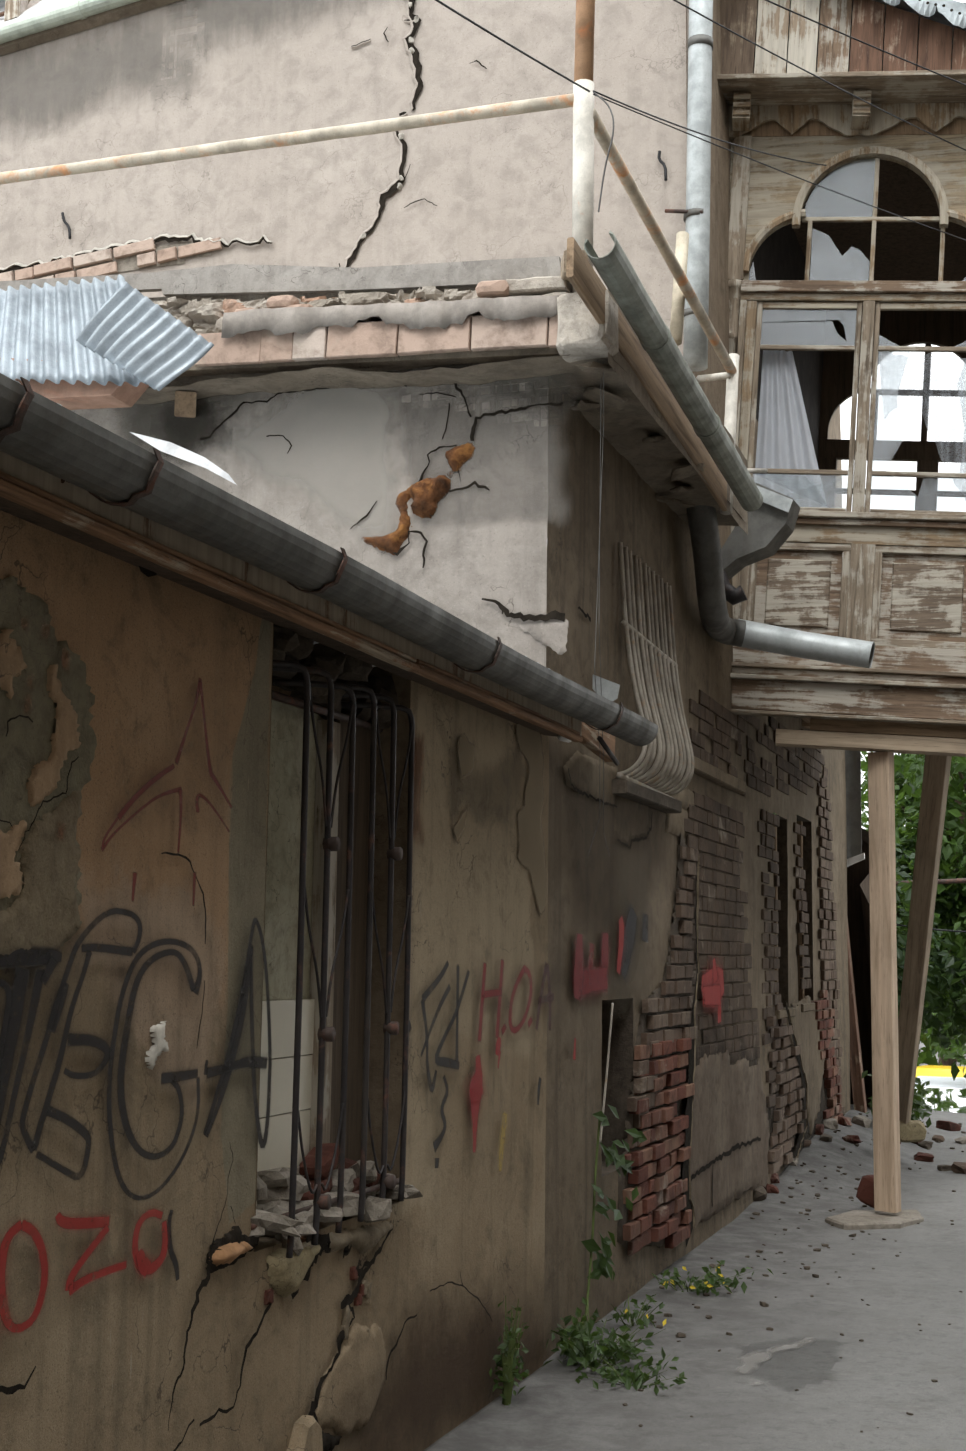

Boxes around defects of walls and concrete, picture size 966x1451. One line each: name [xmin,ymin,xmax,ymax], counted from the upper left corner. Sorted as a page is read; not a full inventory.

crack [339,0,437,267]
flaking render [0,233,272,281]
crack [200,388,329,454]
crack [350,501,377,529]
crack [392,530,428,568]
crack [404,383,563,492]
flaking render [0,576,97,970]
flaking render [617,834,699,1256]
flaking render [766,990,843,1174]
crack [168,1146,274,1451]
crack [305,1229,492,1424]